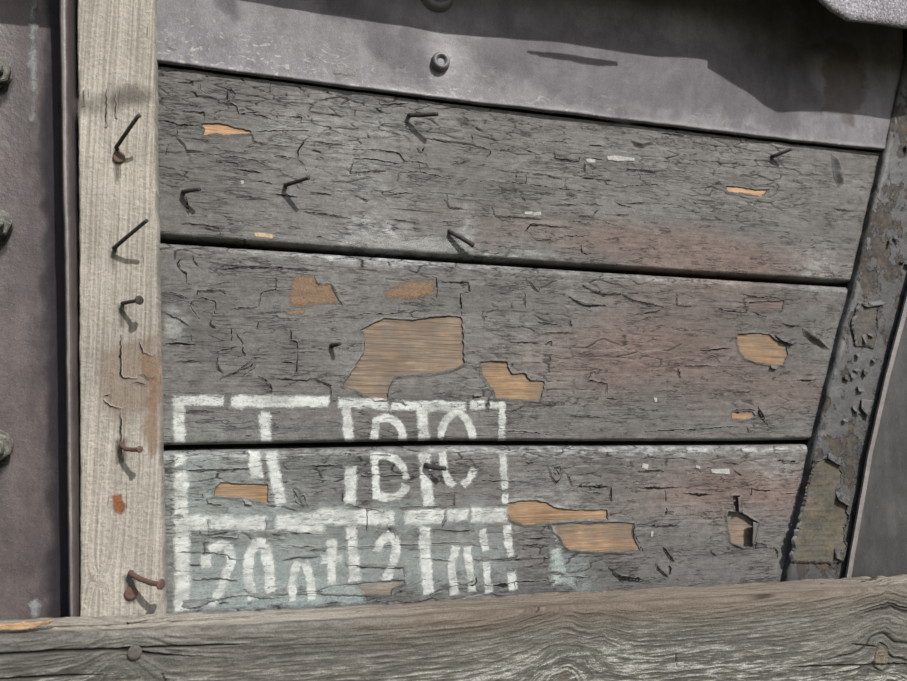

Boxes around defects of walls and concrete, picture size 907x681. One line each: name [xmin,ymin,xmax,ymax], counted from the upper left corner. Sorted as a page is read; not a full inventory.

peeling [199,120,253,138]
crack [159,85,663,255]
crack [103,255,400,458]
peeling [340,313,467,403]
peeling [473,358,547,404]
crack [510,281,801,360]
peeling [734,330,797,369]
corrosion [113,495,125,514]
crack [176,493,244,609]
peeling [211,479,272,507]
crack [264,461,714,588]
peeling [504,497,642,555]